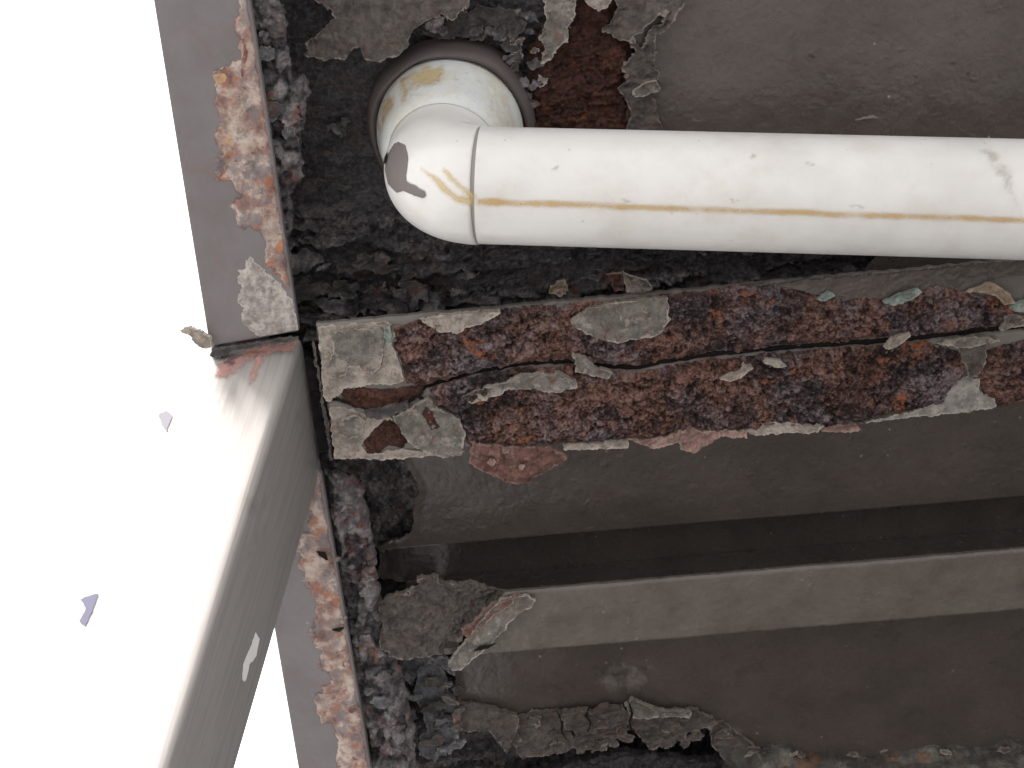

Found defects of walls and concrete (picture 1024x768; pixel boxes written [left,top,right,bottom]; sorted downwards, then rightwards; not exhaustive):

peeling [305,0,527,62]
peeling [538,0,684,130]
crack [336,396,369,409]
peeling [364,396,466,458]
peeling [419,309,500,334]
peeling [462,352,613,404]
corrosion [210,0,1024,768]
peeling [570,271,671,344]
crack [399,325,1024,403]
peeling [747,421,825,436]
peeling [937,281,1024,379]
peeling [378,573,775,763]